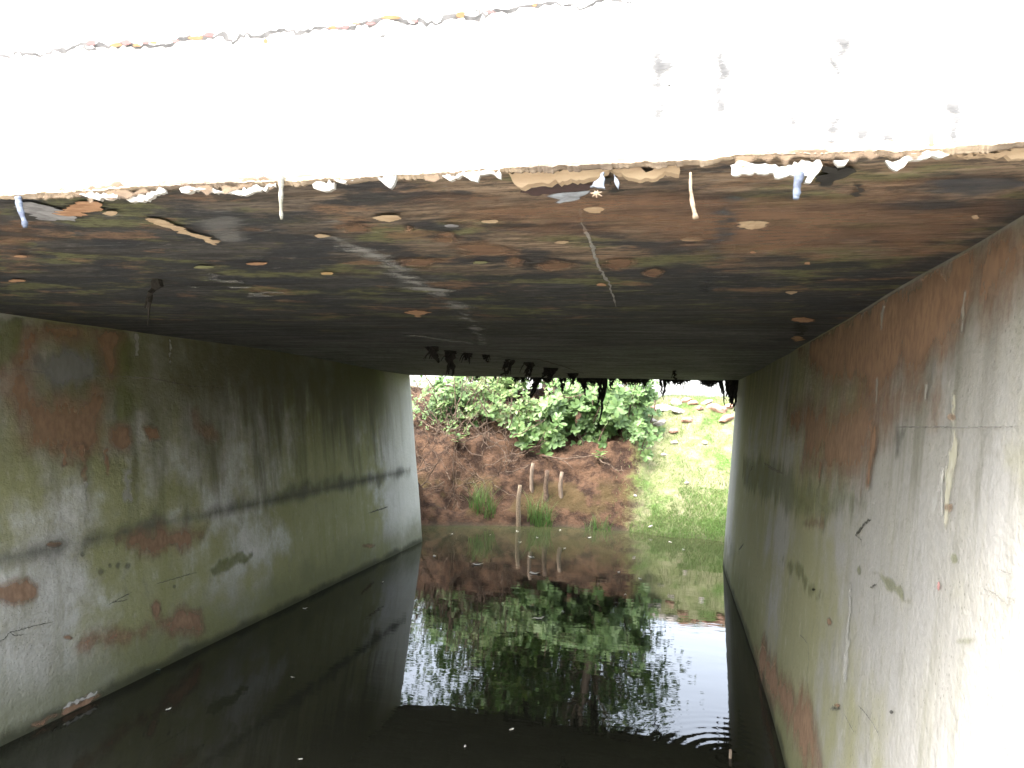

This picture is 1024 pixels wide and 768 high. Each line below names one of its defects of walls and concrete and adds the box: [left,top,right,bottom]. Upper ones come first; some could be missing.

spalling [13,174,278,221]
peeling [312,176,361,193]
peeling [377,174,398,190]
spalling [424,166,680,213]
peeling [731,148,1024,197]